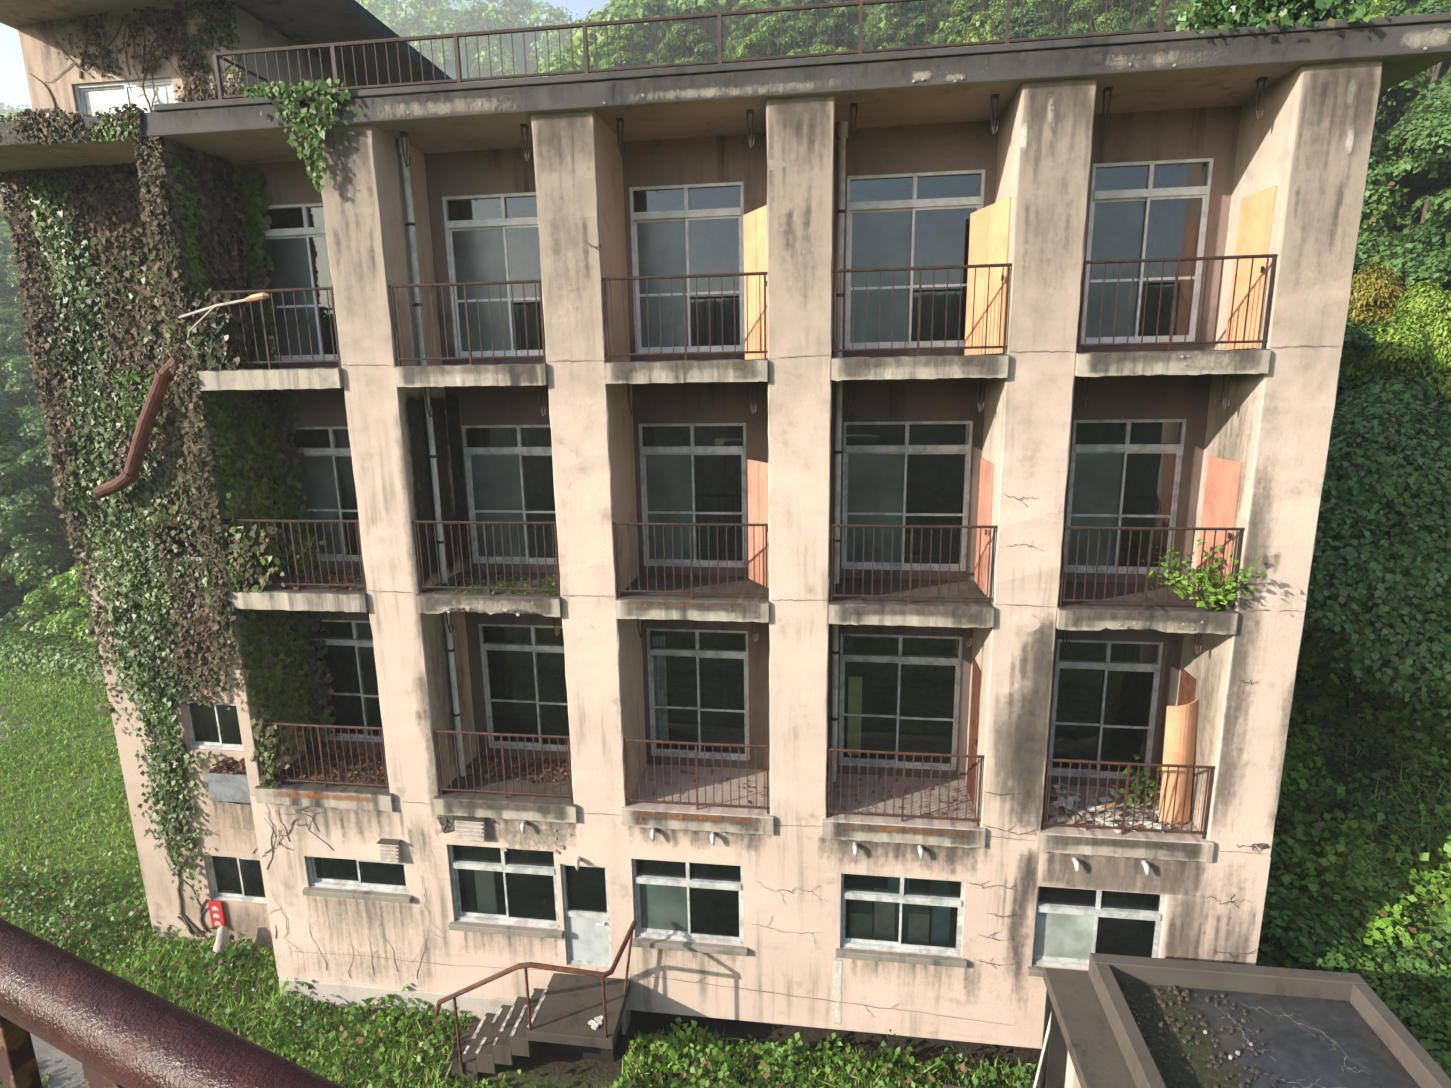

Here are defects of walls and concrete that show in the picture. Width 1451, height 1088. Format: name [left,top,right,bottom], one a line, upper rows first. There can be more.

leakage [1311,68,1373,152]
leakage [1069,496,1277,814]
corrosion [280,792,368,802]
leakage [1000,622,1201,976]
crack [752,882,826,941]
crack [970,880,1020,969]